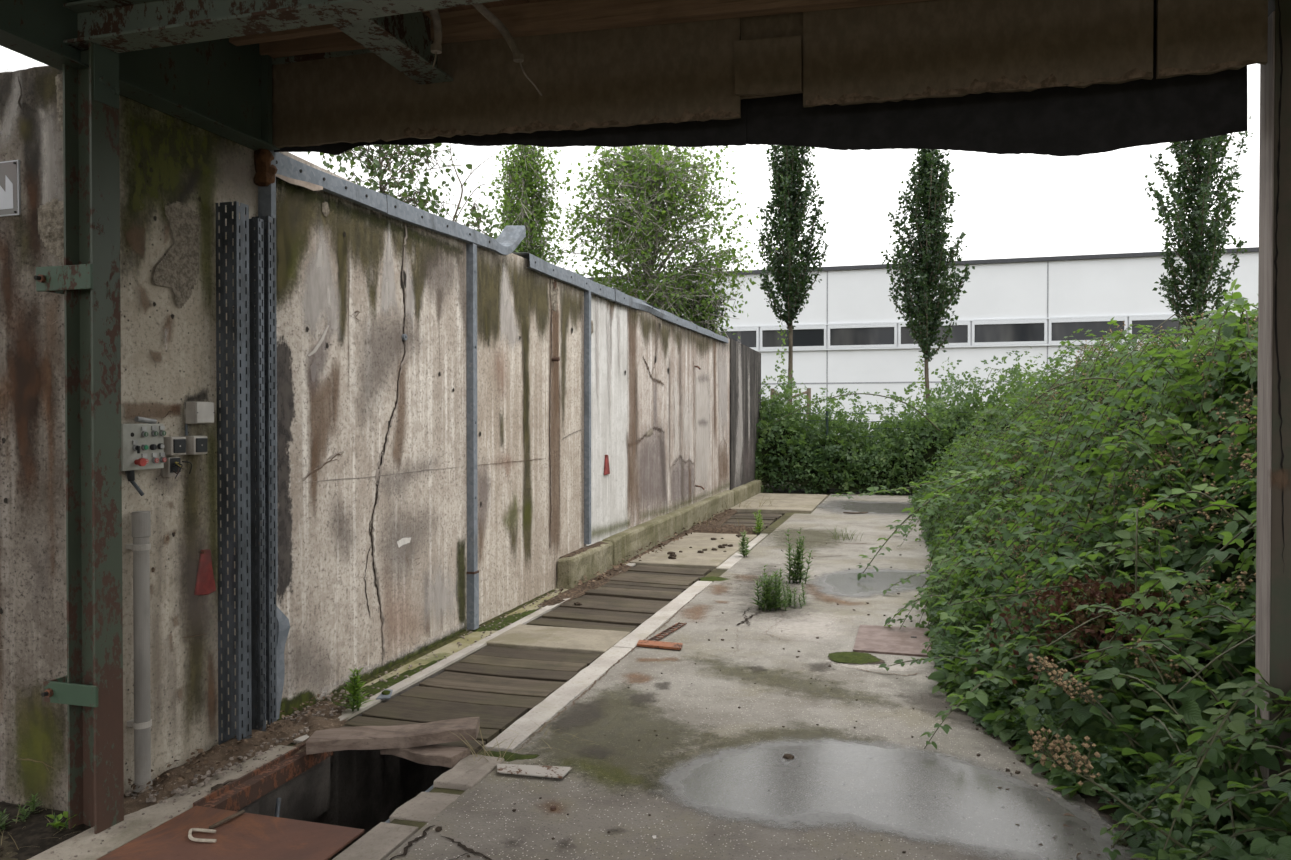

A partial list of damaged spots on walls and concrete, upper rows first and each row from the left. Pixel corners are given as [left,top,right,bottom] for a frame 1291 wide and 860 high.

water stain [277,423,293,604]
crack [302,451,344,481]
water stain [310,368,339,502]
water stain [304,235,347,342]
crack [364,223,408,666]
water stain [367,243,426,320]
water stain [393,371,405,463]
water stain [485,271,529,425]
water stain [582,304,639,509]
water stain [669,351,681,449]
water stain [709,348,750,482]
crack [390,825,492,860]